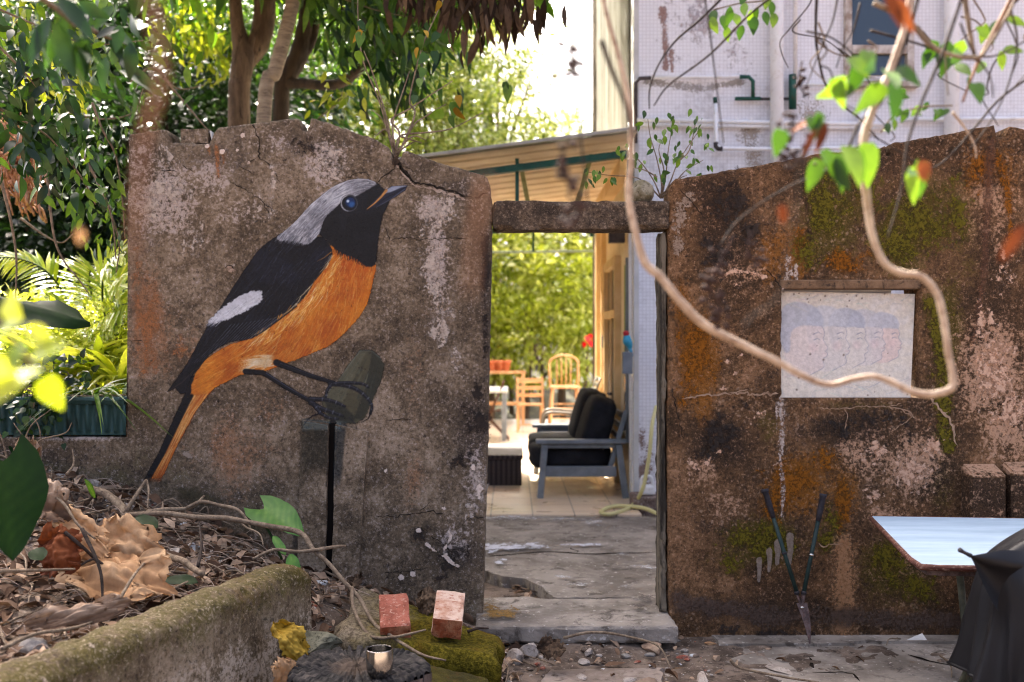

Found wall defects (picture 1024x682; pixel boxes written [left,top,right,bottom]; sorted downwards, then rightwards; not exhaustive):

crack [234,125,280,212]
crack [348,162,479,201]
rust [674,279,723,412]
crack [671,389,778,440]
damp [775,397,786,517]
rust [755,444,844,526]
crack [821,398,958,446]
spalling [416,528,460,568]
damp [669,534,961,636]